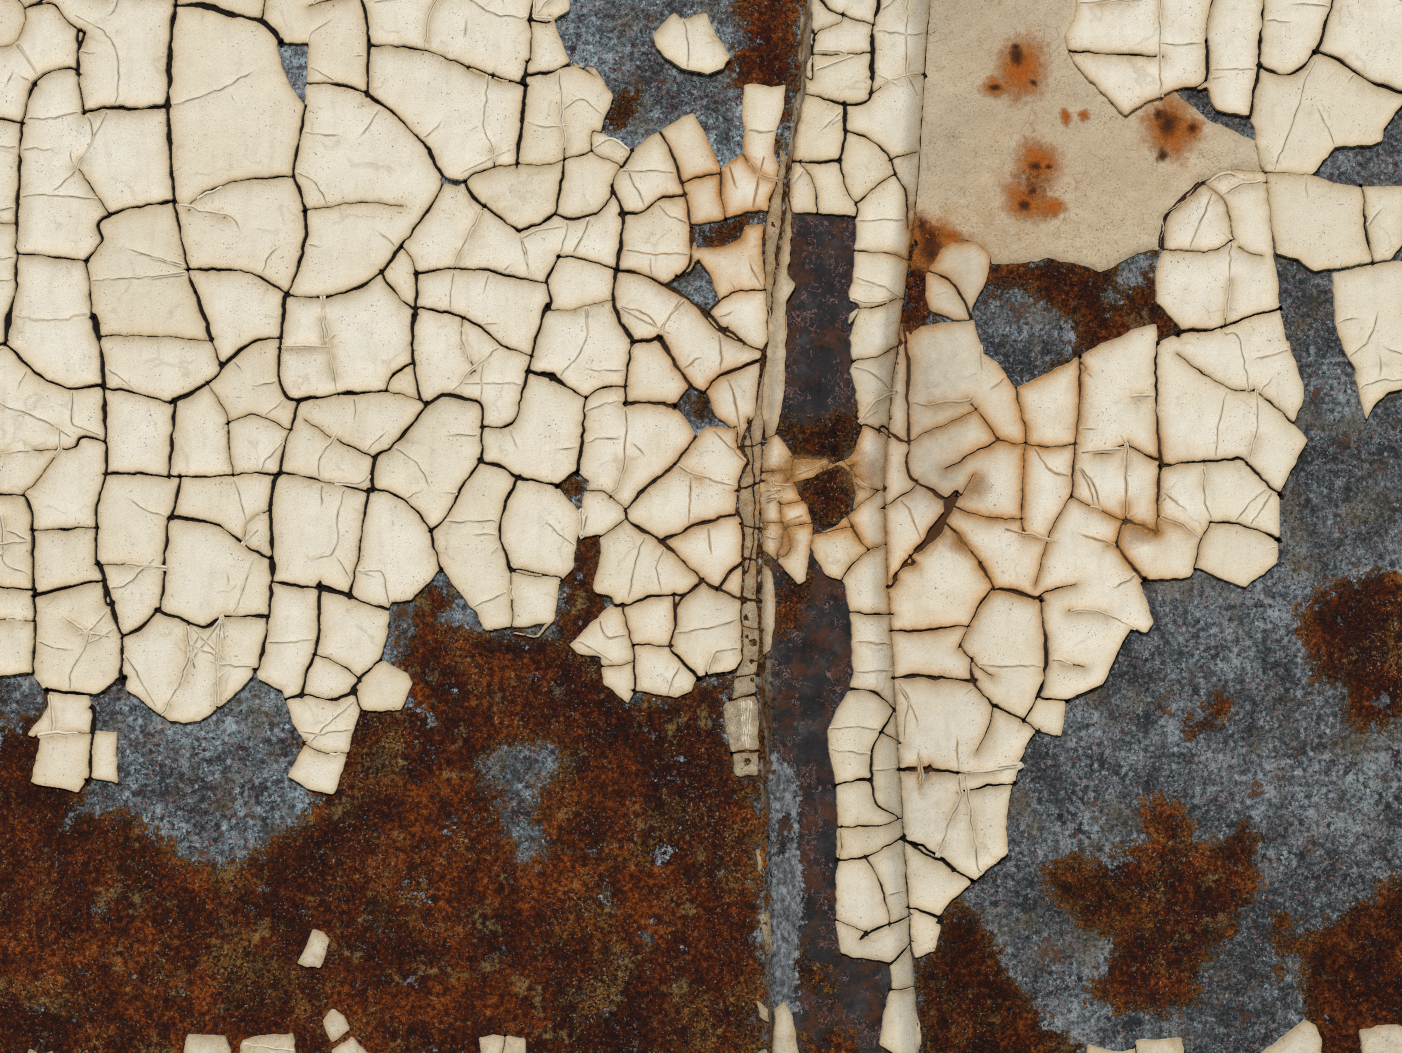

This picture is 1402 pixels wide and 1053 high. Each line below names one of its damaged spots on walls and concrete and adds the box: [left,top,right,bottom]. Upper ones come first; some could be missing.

crack [1248,0,1402,119]
peeling [0,0,930,724]
crack [0,0,1294,785]
rust [0,0,868,1053]
peeling [827,0,1402,1053]
peeling [28,582,122,793]
peeling [286,592,413,795]
crack [831,687,976,940]
crack [898,765,1018,792]
rust [912,897,1087,1053]
rust [1034,790,1402,1053]
rust [1291,563,1402,744]